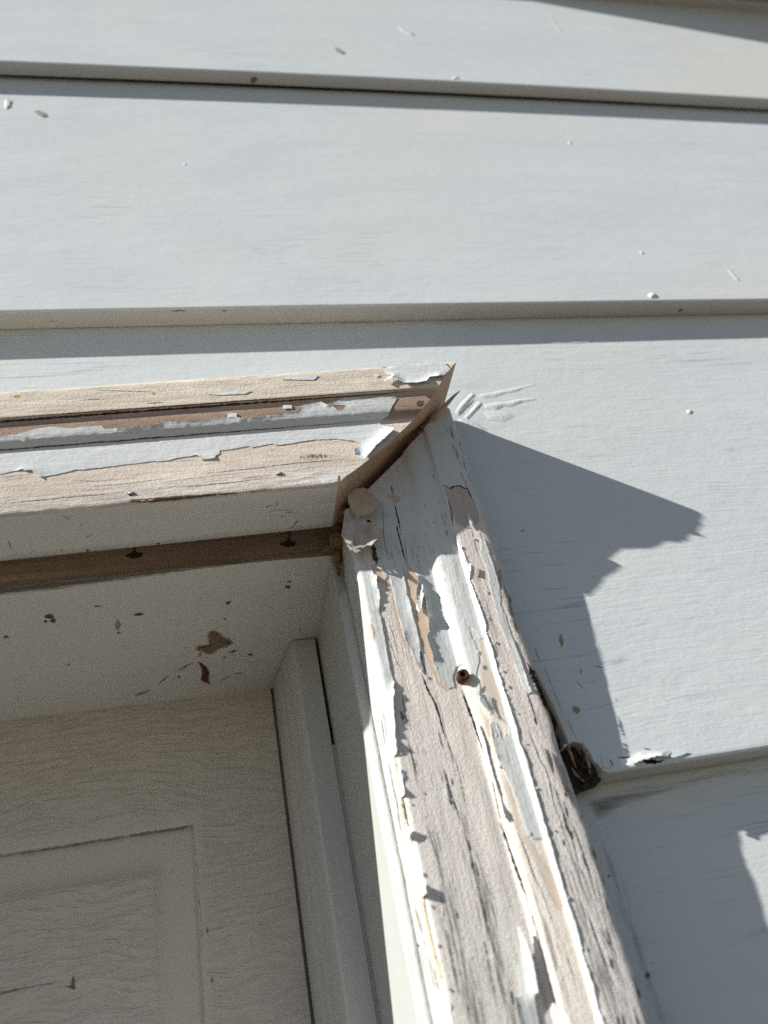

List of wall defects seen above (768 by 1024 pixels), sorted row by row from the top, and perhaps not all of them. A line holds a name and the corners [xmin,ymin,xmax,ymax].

peeling [374,362,450,383]
peeling [0,396,397,477]
peeling [319,475,338,484]
peeling [341,408,604,1024]
peeling [626,750,688,766]